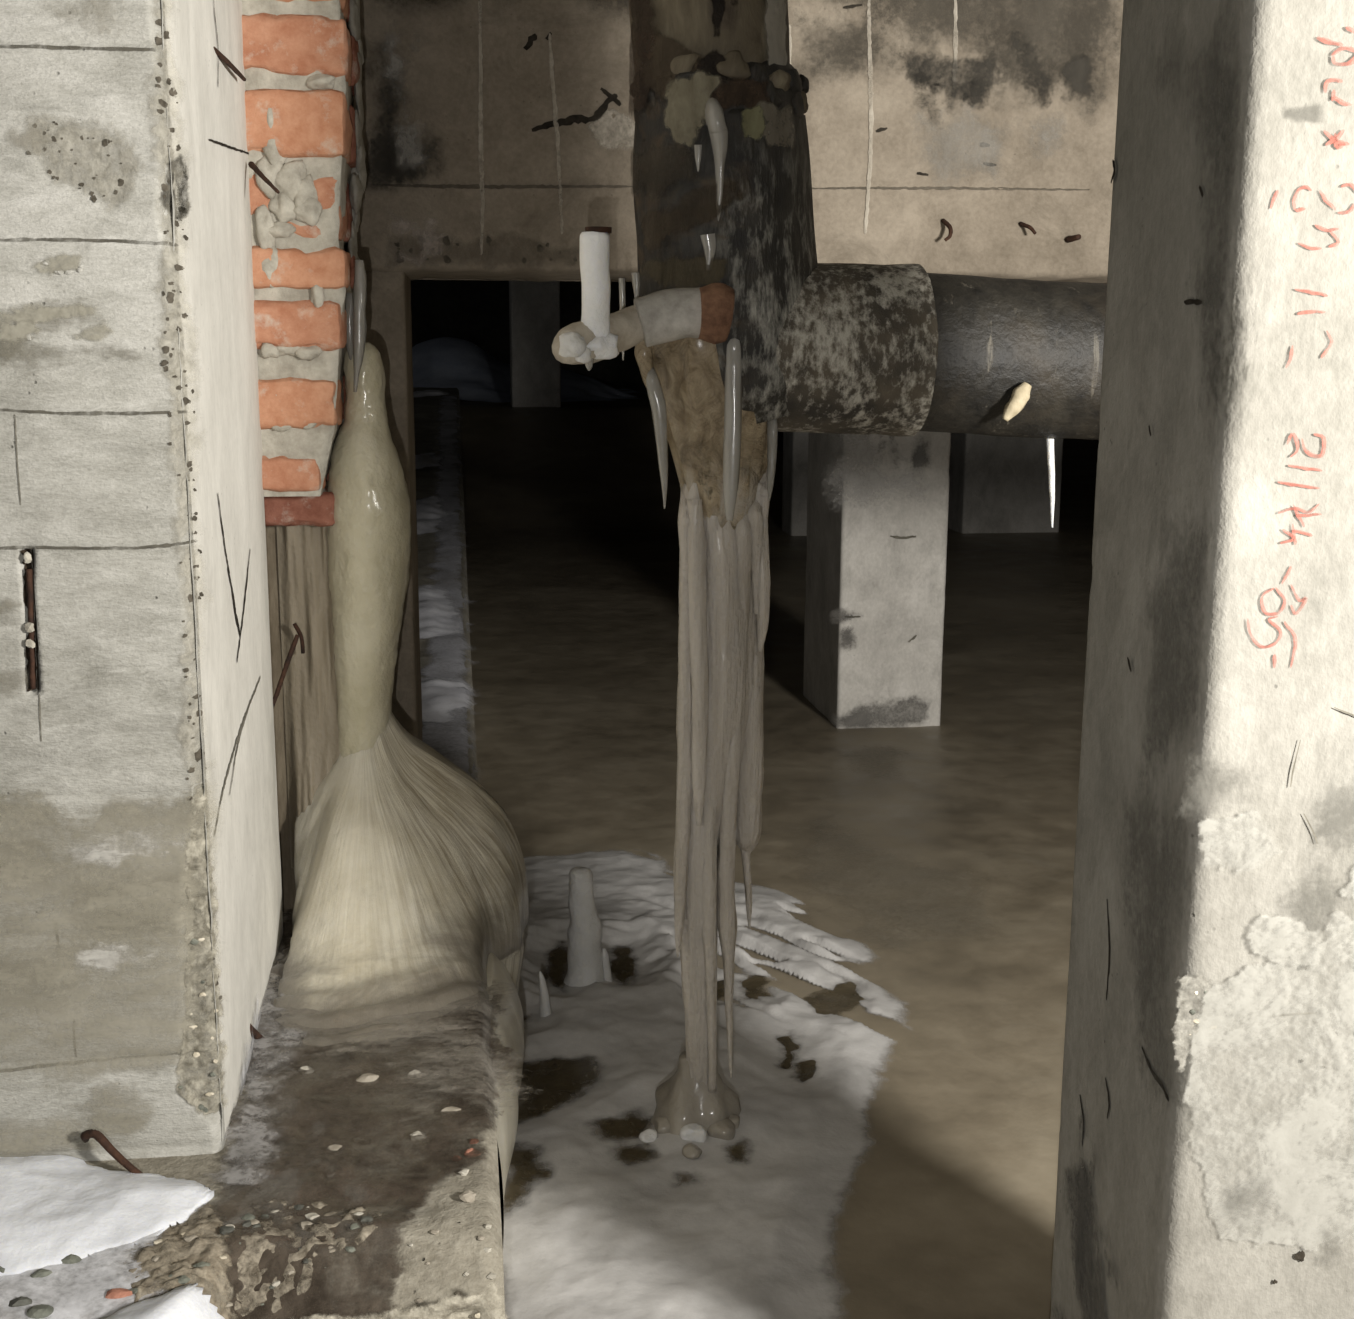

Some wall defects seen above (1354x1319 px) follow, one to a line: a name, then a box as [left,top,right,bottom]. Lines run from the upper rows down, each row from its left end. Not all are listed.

crack [532,87,621,132]
corrosion [21,549,39,692]
spalling [309,1283,507,1319]